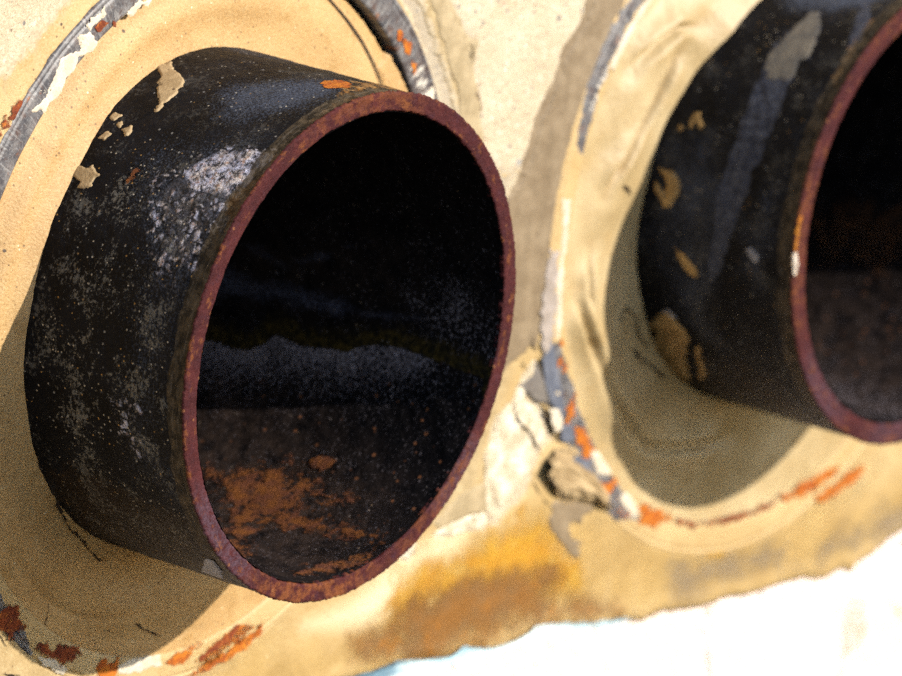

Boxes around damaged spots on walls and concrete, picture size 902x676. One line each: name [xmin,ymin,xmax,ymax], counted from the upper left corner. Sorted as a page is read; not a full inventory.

peeling [32,6,106,113]
peeling [154,61,185,112]
peeling [610,0,651,71]
peeling [98,112,133,140]
peeling [73,165,100,188]
spalling [434,198,640,558]
crack [514,332,562,453]
corrosion [202,455,383,575]
corrosion [617,465,865,529]
corrosion [0,603,27,641]
corrosion [34,643,82,665]
corrosion [166,624,263,676]